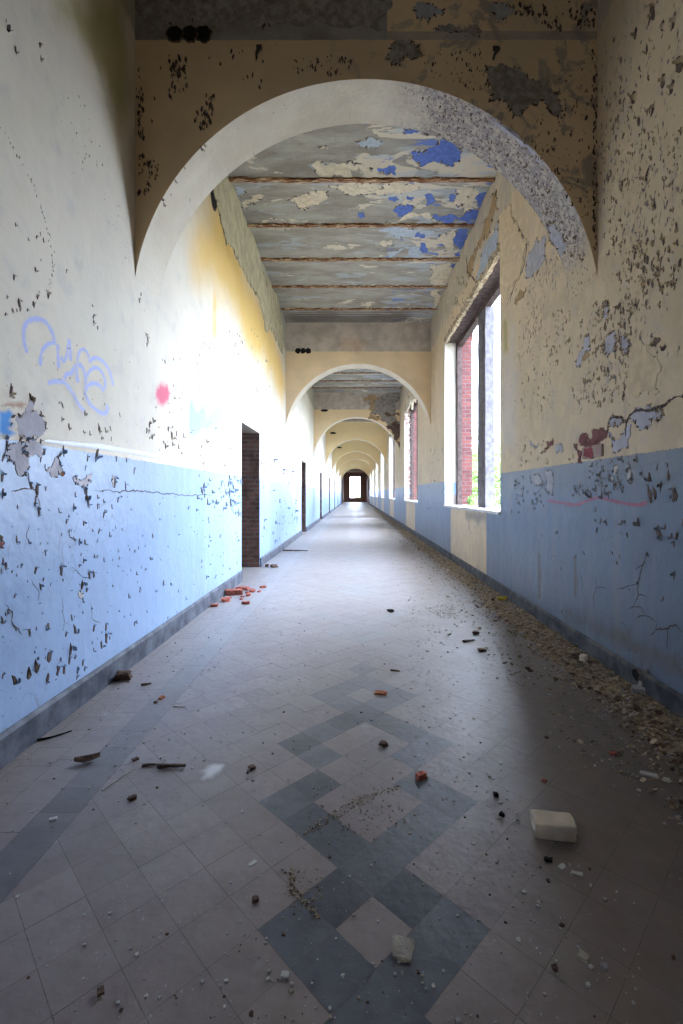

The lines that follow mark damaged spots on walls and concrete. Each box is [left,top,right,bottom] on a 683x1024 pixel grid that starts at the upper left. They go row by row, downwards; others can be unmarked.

peeling [136,53,188,196]
peeling [194,93,215,131]
peeling [355,137,385,151]
peeling [213,176,293,354]
peeling [286,145,499,336]
spalling [385,1,683,538]
peeling [361,392,417,447]
peeling [1,383,161,699]
crack [98,488,211,496]
peeling [654,519,683,548]
crack [579,557,679,649]